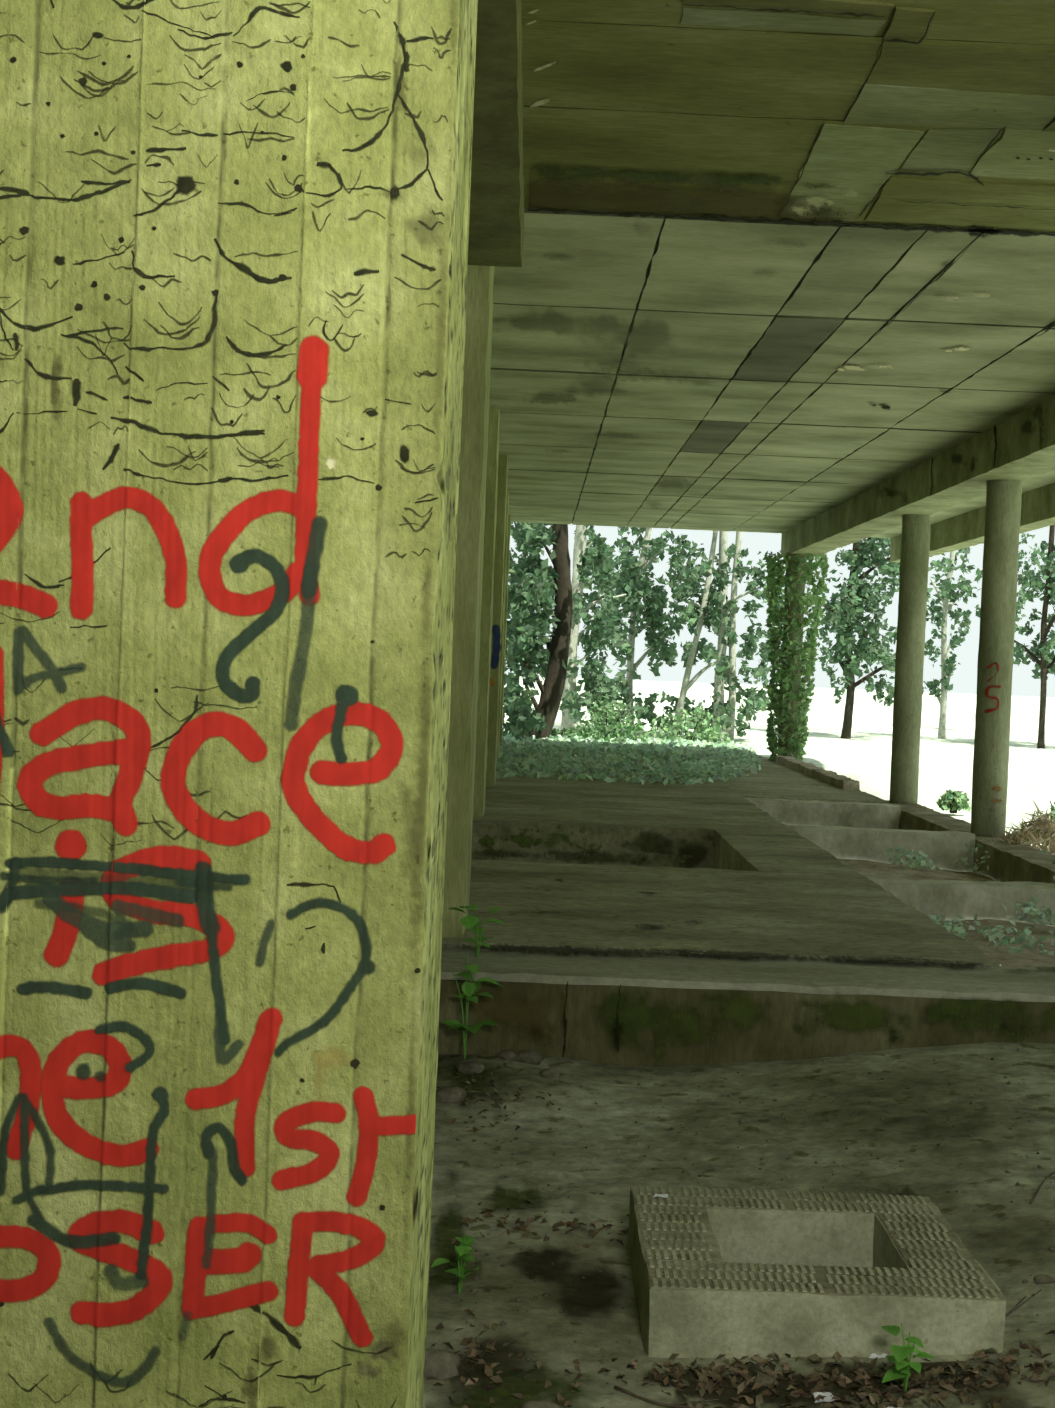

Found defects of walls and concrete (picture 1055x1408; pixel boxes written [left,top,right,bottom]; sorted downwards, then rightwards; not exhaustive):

peeling [792,193,850,215]
crack [0,0,452,558]
crack [0,548,111,628]
crack [4,679,45,752]
crack [101,683,258,846]
crack [0,795,62,833]
crack [287,882,341,902]
crack [8,1362,129,1403]
crack [166,1305,397,1408]